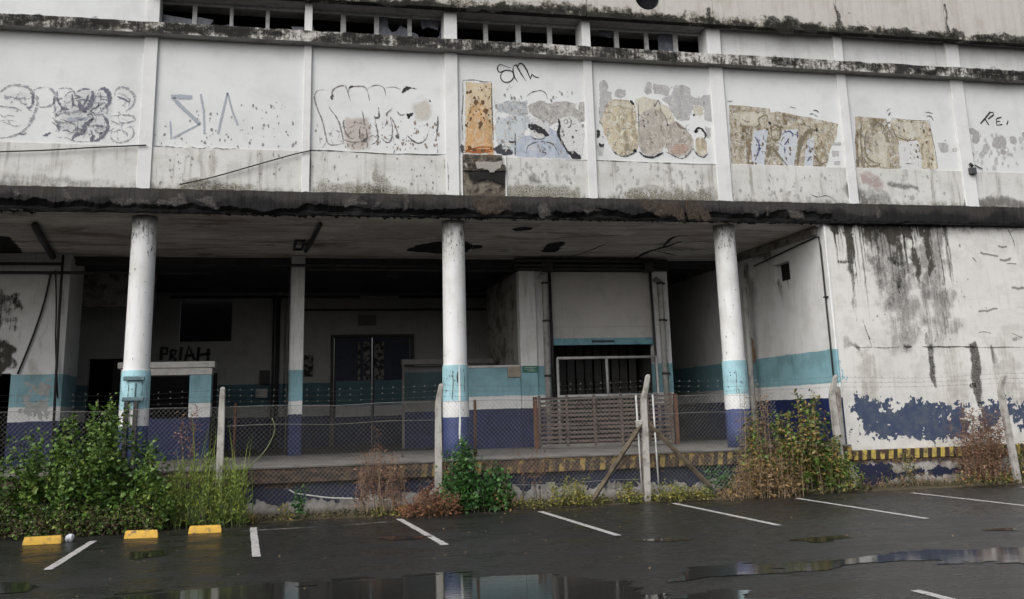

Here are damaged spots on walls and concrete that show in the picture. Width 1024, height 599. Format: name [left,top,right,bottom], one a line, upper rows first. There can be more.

leakage [764,15,821,35]
leakage [834,6,869,33]
leakage [884,27,912,37]
leakage [926,3,1024,45]
leakage [973,67,1024,83]
spalling [473,91,584,214]
spalling [730,107,838,218]
spalling [856,119,951,217]
leakage [827,224,973,319]
leakage [928,345,936,386]
leakage [970,341,995,405]
peeling [849,391,1024,447]